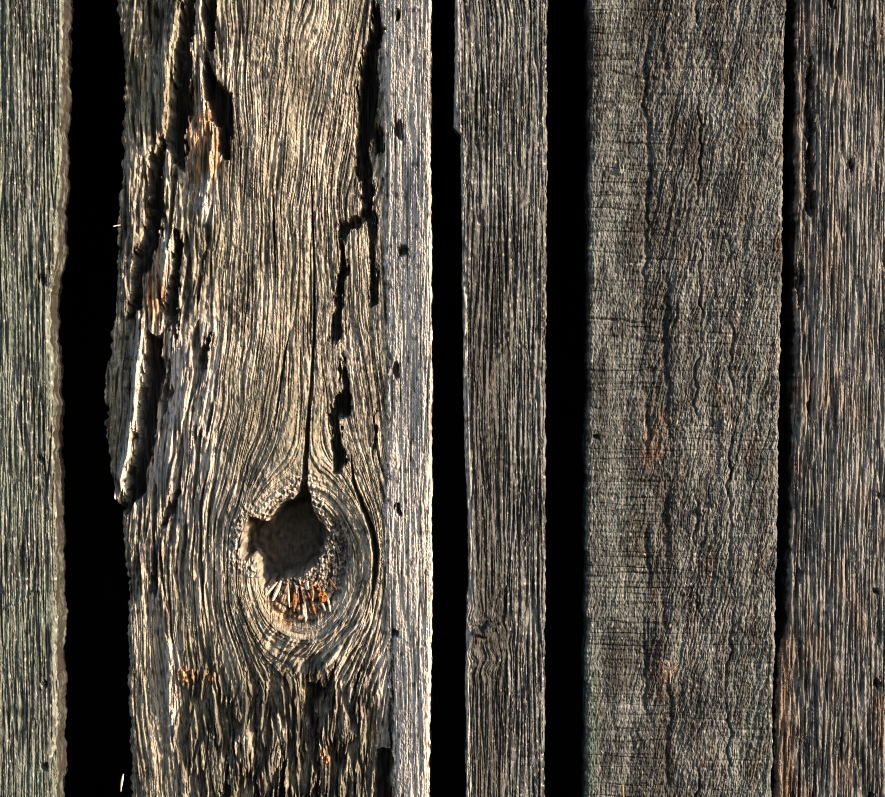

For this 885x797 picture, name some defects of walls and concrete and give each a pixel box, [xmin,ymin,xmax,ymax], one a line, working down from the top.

crack [123,0,235,517]
crack [243,234,251,337]
crack [270,176,278,280]
crack [299,0,387,614]
crack [273,329,291,433]
crack [159,480,184,531]
crack [148,556,160,609]
crack [204,677,287,797]
crack [301,659,368,797]
crack [372,633,396,797]